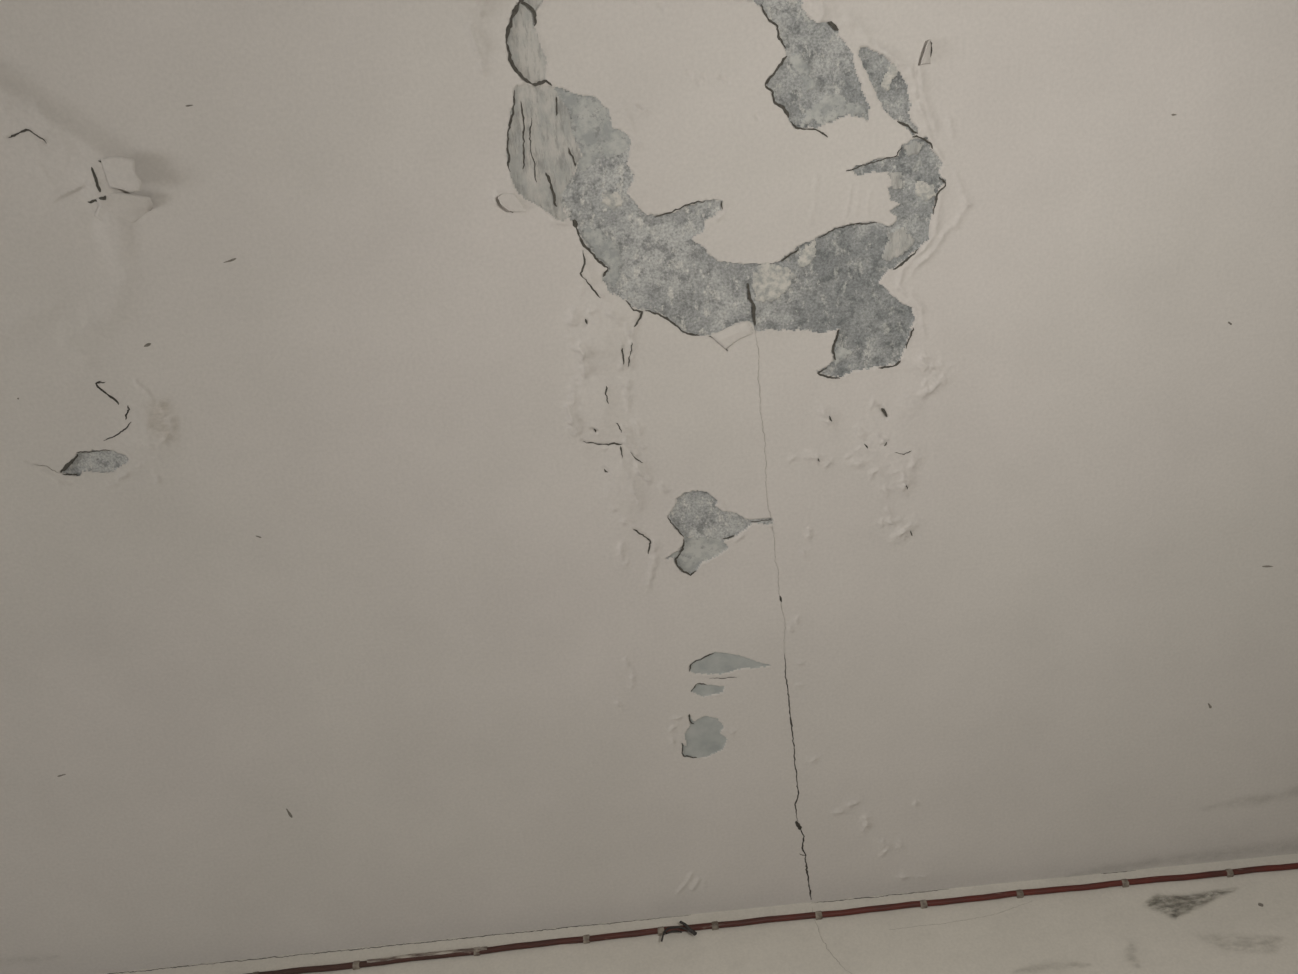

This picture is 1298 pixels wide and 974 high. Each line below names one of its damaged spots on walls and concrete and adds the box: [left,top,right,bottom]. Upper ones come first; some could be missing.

peeling [485,0,977,389]
peeling [13,375,194,491]
peeling [656,482,786,583]
peeling [663,645,778,763]
crack [755,329,947,974]